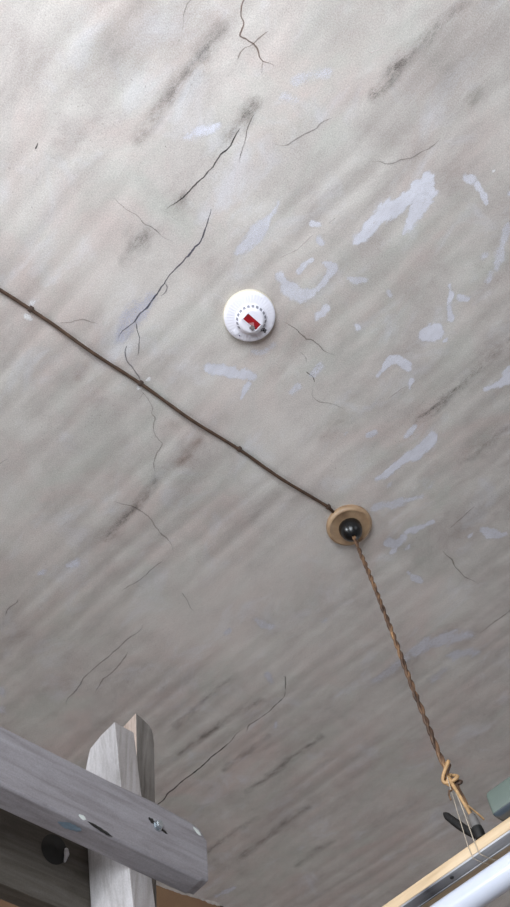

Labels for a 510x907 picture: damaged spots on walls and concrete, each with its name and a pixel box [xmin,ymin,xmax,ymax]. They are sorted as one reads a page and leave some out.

crack [239,0,267,63]
crack [169,130,239,207]
peeling [351,171,439,246]
crack [119,212,211,378]
peeling [274,257,338,322]
peeling [482,365,510,392]
peeling [374,431,438,488]
crack [158,677,286,804]